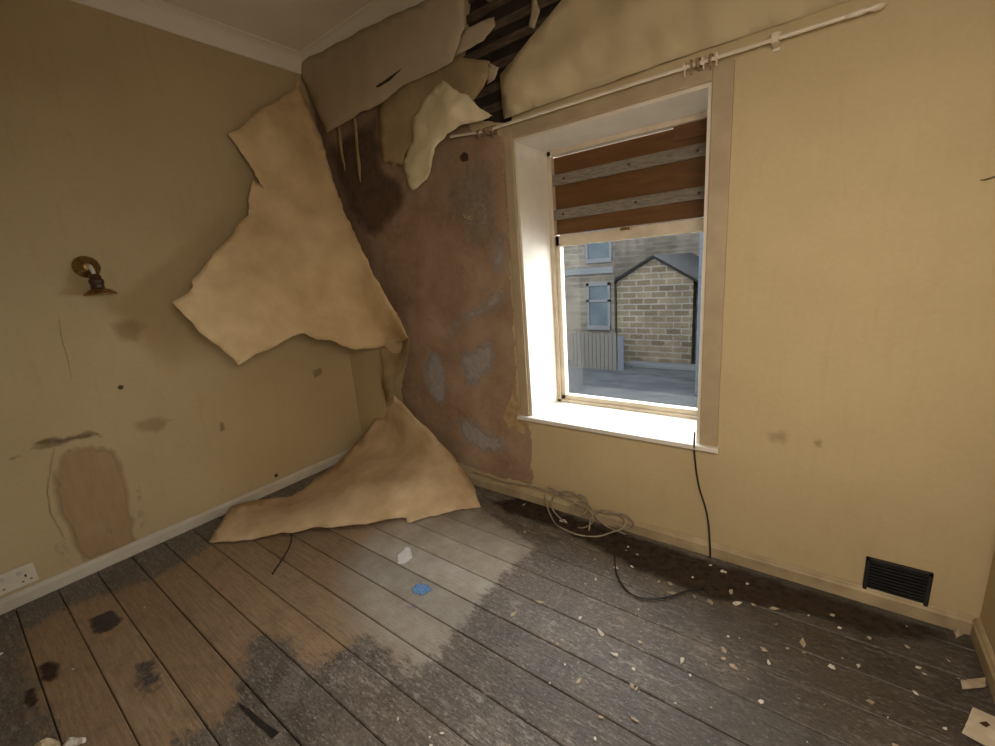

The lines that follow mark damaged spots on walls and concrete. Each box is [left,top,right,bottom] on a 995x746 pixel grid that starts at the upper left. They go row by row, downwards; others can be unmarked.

flaking render [309,0,561,485]
peeling [47,448,134,559]